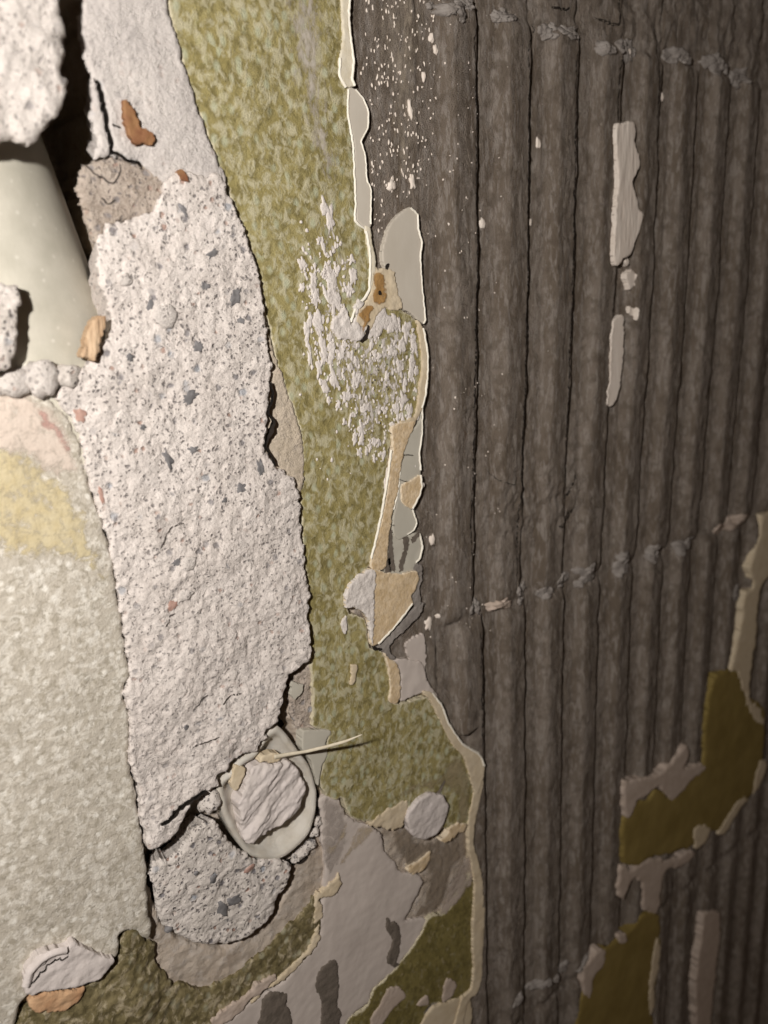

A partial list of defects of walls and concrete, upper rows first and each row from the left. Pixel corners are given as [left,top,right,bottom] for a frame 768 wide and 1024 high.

peeling [610,121,644,290]
damp [297,195,421,490]
rust [359,272,387,331]
peeling [606,306,640,407]
peeling [210,0,485,1024]
peeling [615,848,695,914]
peeling [22,936,114,996]
peeling [688,909,721,1024]